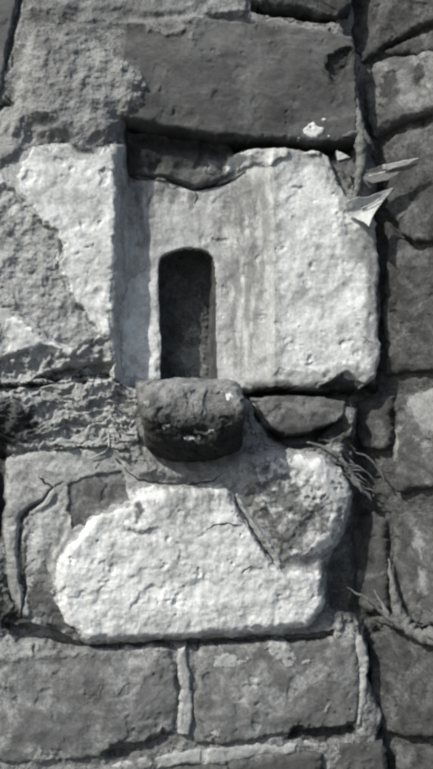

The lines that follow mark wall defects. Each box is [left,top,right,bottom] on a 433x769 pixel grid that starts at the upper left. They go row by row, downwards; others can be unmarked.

leakage [127,138,226,244]
leakage [178,325,205,378]
crack [17,477,64,617]